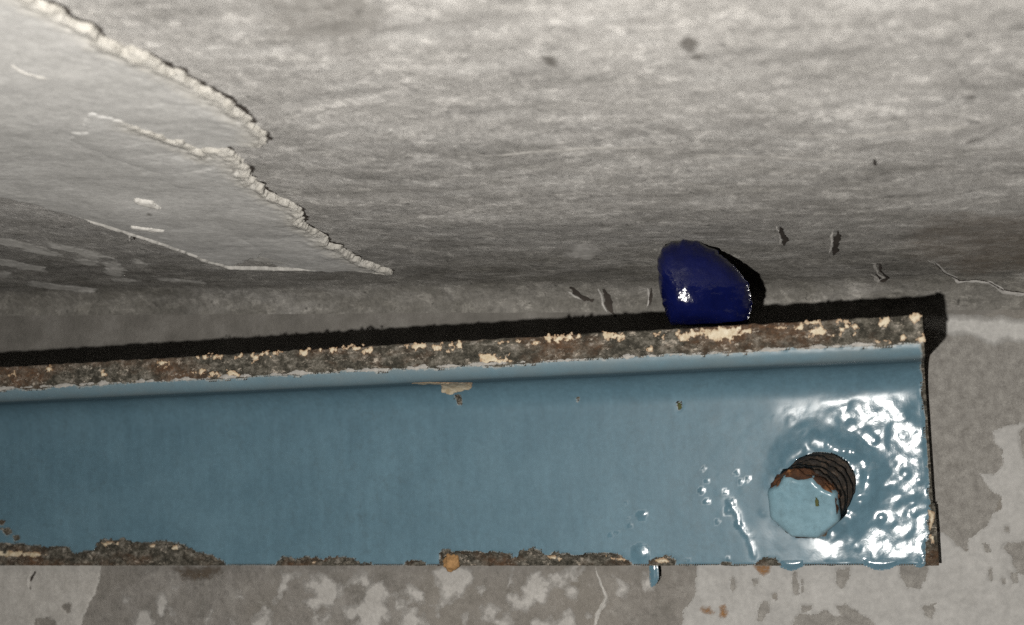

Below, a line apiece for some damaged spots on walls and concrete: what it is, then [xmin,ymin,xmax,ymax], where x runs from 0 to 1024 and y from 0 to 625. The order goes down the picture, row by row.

peeling [0,0,395,276]
peeling [0,239,206,293]
corrosion [770,468,840,514]
corrosion [0,537,224,579]
corrosion [280,557,366,566]
corrosion [440,548,630,566]
corrosion [648,556,673,566]